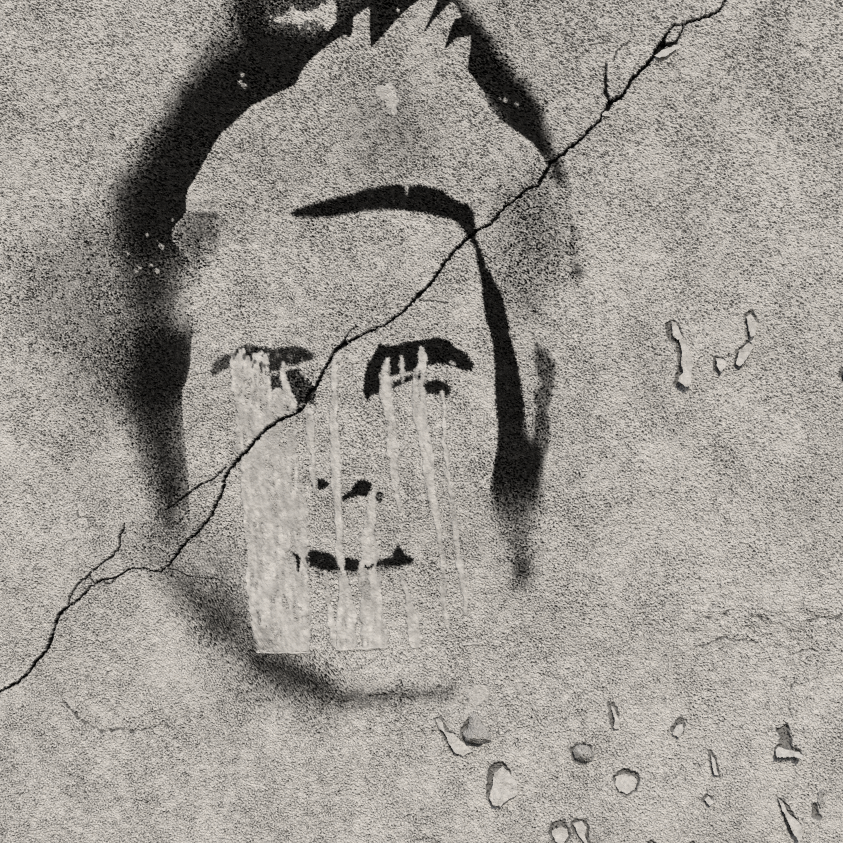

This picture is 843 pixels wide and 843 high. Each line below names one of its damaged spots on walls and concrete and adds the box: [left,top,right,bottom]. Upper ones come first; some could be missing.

crack [0,0,726,693]
flaking render [665,320,694,388]
flaking render [713,310,757,377]
flaking render [434,711,491,757]
flaking render [486,761,517,807]
flaking render [548,818,591,843]
flaking render [569,743,594,765]
flaking render [613,768,640,796]
flaking render [707,750,721,778]
flaking render [774,724,803,760]
flaking render [776,795,803,843]
flaking render [812,789,827,820]